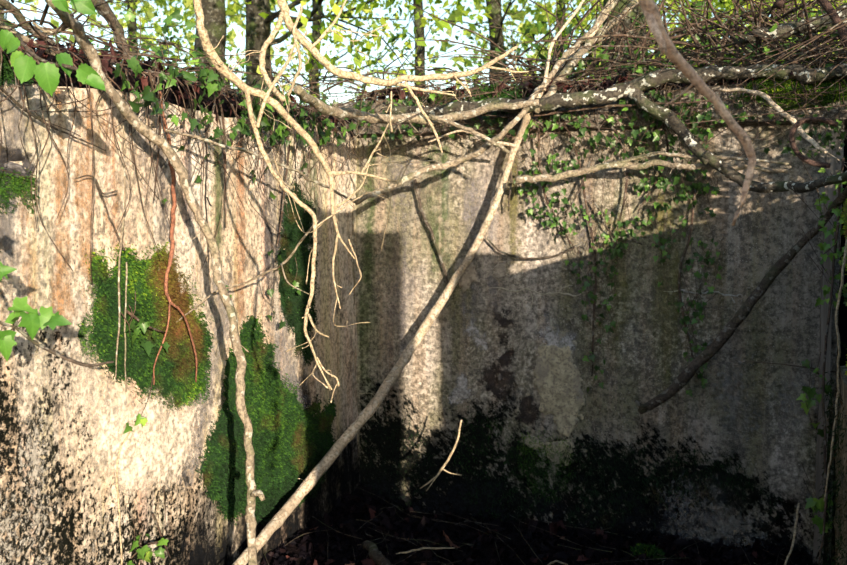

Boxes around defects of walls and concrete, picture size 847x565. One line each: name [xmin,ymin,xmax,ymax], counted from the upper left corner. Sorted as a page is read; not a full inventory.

water stain [156,146,194,285]
water stain [0,353,52,565]
water stain [79,276,92,315]
water stain [96,390,282,565]
water stain [287,355,318,420]
water stain [449,277,540,425]
water stain [246,437,814,565]
flaking render [525,340,585,466]